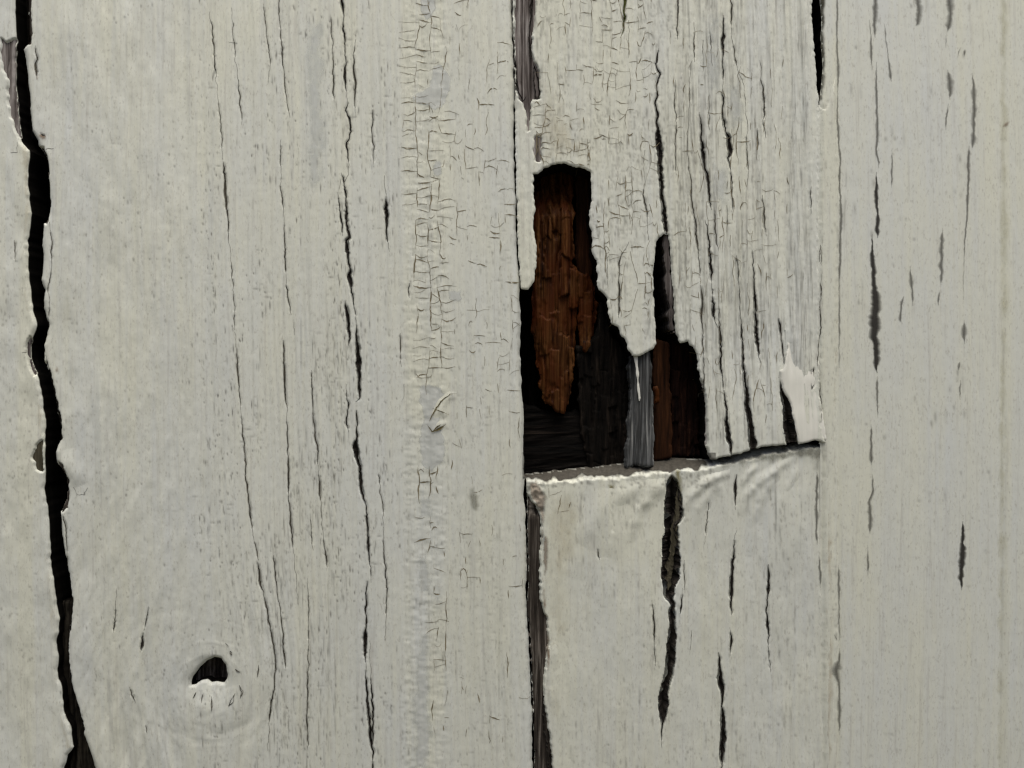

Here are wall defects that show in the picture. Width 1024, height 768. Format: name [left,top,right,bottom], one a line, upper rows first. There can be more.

crack [914,0,922,24]
crack [945,0,953,29]
crack [938,51,976,302]
crack [46,222,54,330]
crack [869,0,913,530]
crack [193,0,327,748]
crack [331,0,812,768]
peeling [780,343,826,444]
crack [958,524,966,588]